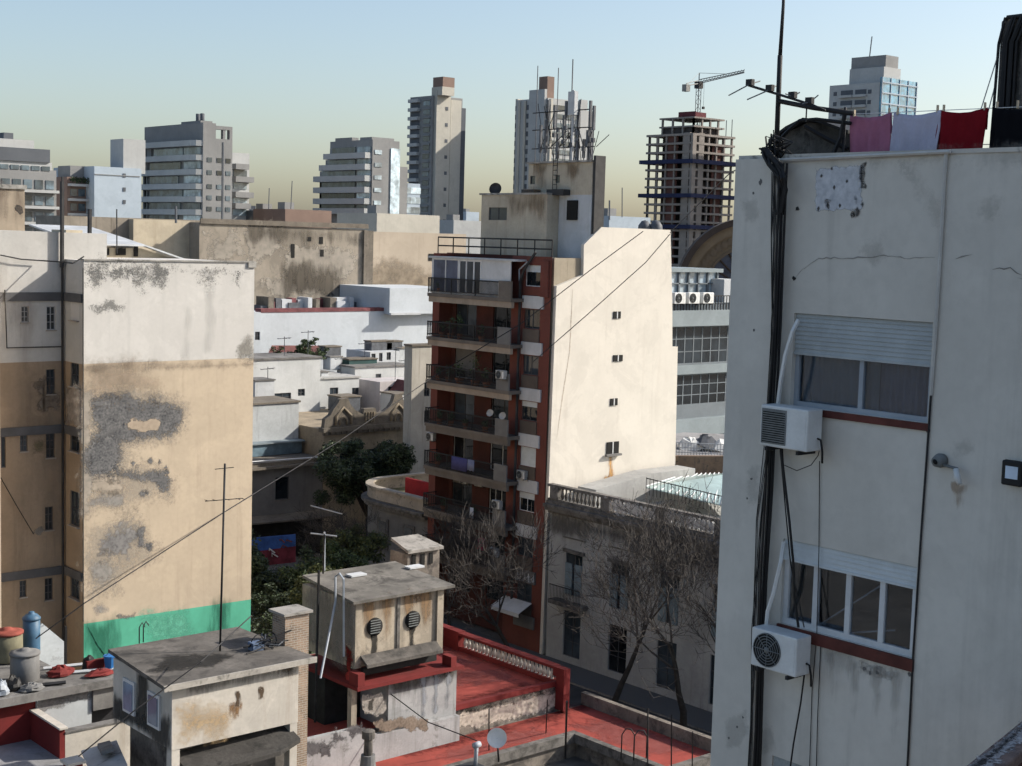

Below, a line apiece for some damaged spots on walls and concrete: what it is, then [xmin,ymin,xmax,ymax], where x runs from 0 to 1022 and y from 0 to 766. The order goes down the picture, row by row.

peeling [815,165,863,218]
water stain [86,261,174,287]
crack [796,255,969,277]